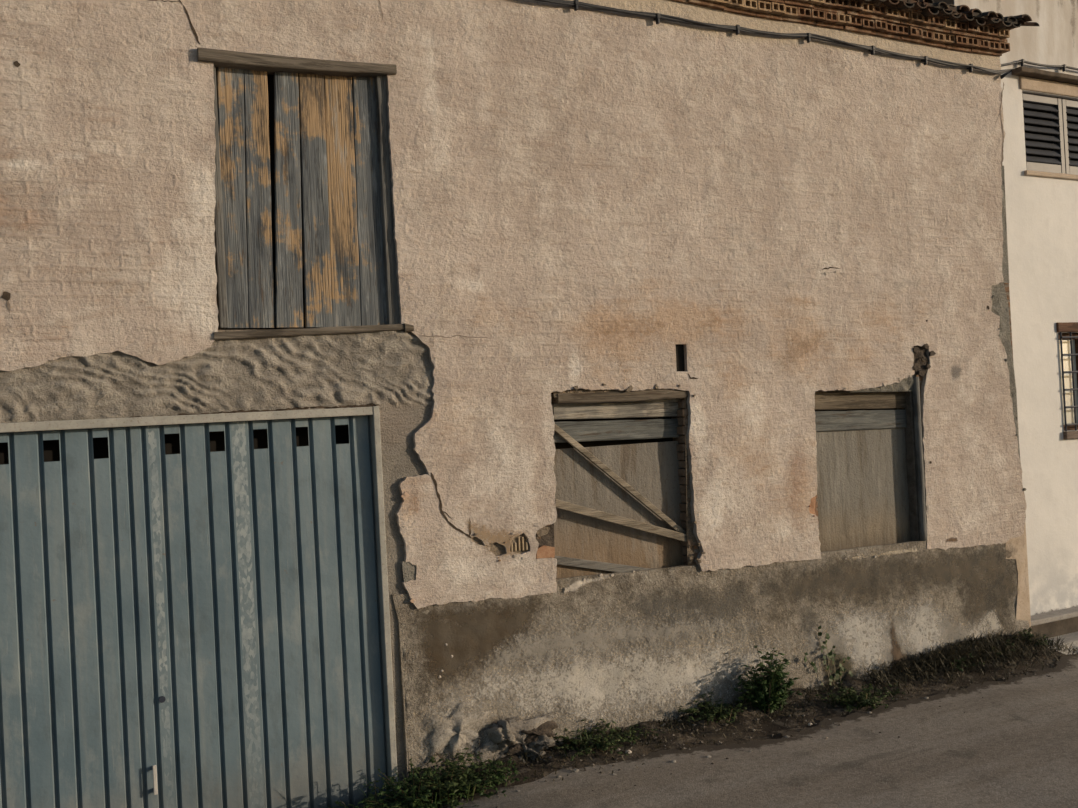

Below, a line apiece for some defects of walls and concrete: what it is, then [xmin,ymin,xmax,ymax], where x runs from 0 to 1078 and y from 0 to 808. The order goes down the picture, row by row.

crack [148,0,200,44]
flaking render [987,166,1020,457]
crack [431,473,490,547]
flaking render [402,561,416,582]
flaking render [472,523,555,561]
flaking render [563,573,614,593]
flaking render [841,548,918,560]
water stain [419,588,785,757]